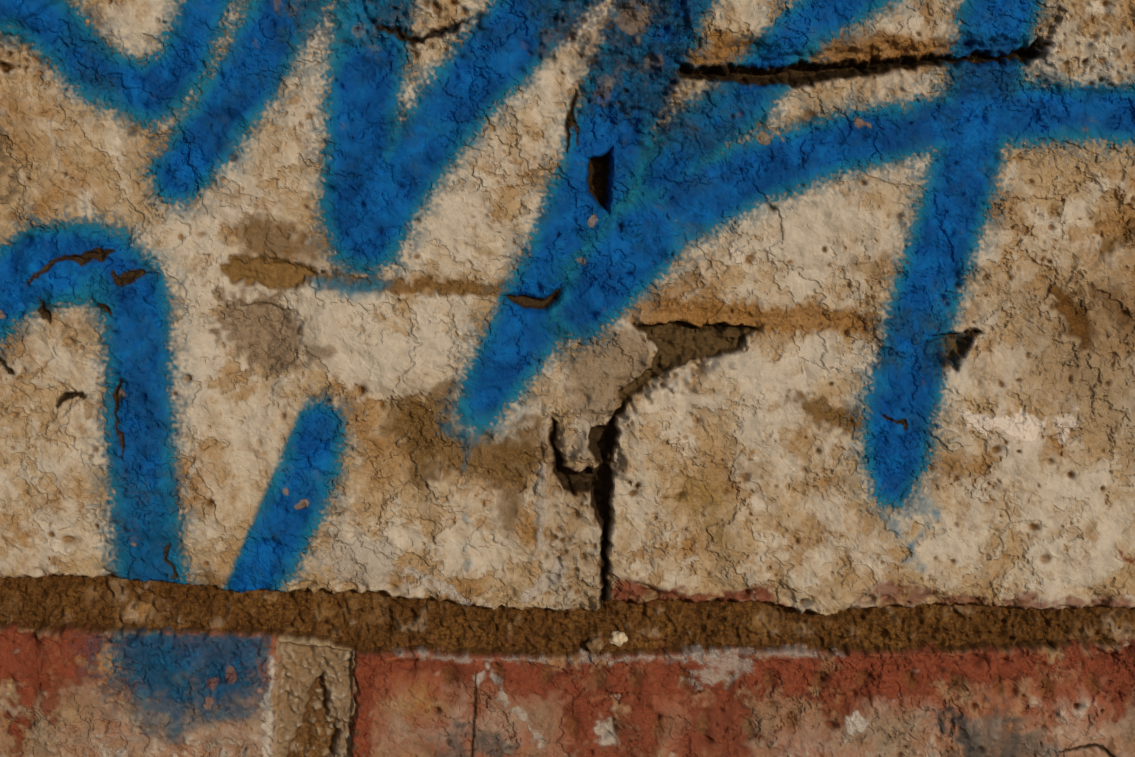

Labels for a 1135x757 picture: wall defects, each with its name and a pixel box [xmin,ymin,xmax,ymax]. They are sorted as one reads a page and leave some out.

crack [550,416,617,607]